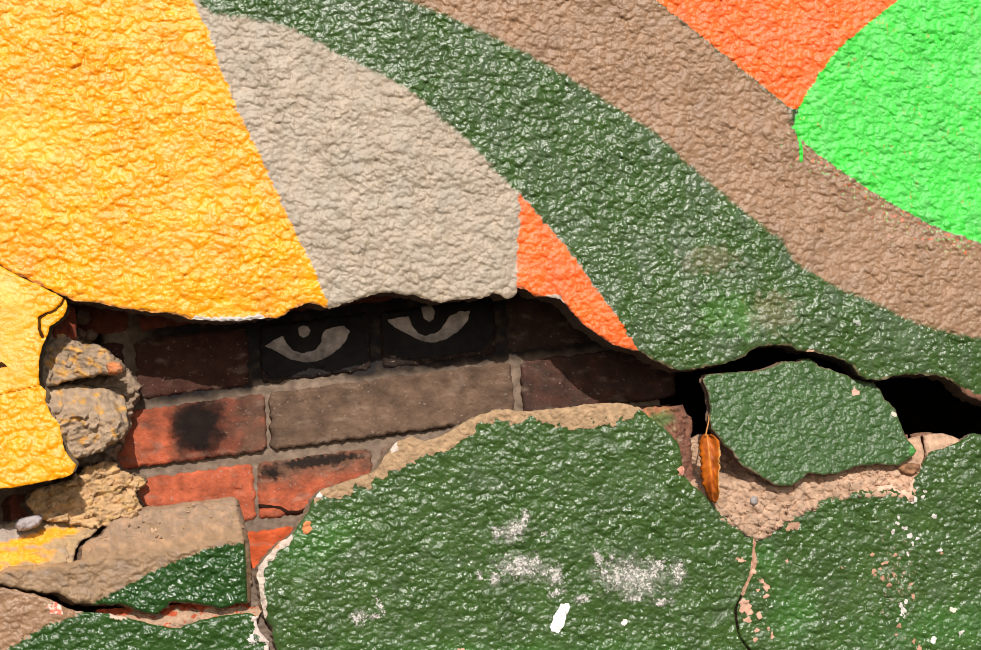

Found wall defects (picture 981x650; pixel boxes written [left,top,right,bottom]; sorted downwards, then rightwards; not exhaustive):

crack [21,277,65,338]
spalling [52,306,80,340]
spalling [314,403,927,541]
peeling [46,602,63,615]
spalling [92,521,312,628]
water stain [477,509,564,598]
water stain [593,549,684,606]
crack [734,538,757,650]
peeling [870,515,927,636]